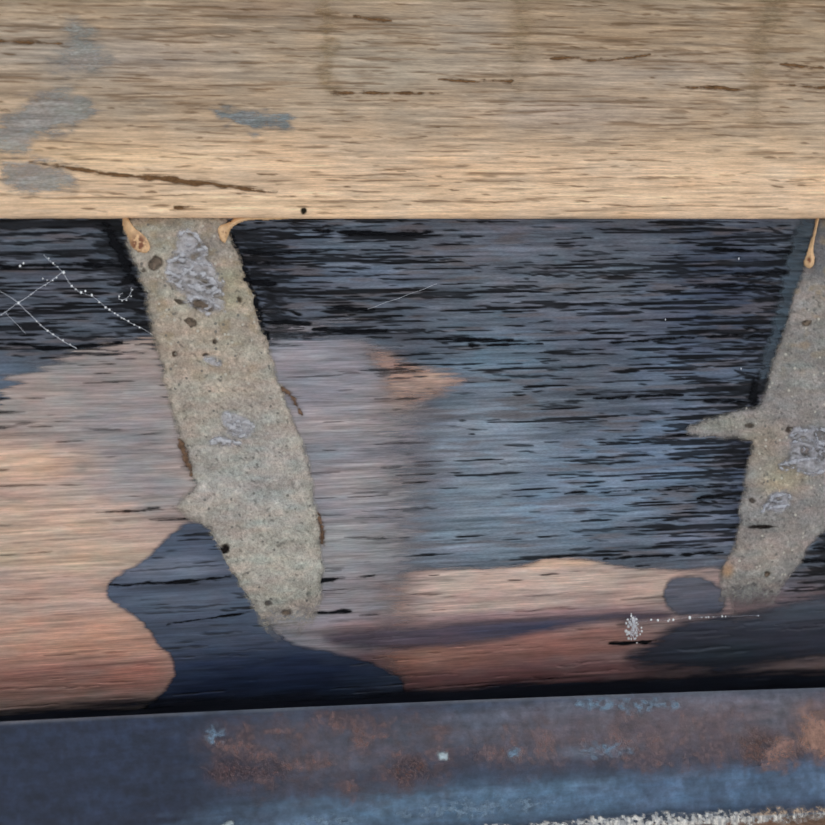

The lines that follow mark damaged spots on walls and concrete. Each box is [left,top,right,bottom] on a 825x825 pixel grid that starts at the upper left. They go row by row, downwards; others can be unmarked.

leakage [0,88,97,192]
leakage [214,107,293,135]
rust [740,712,825,770]